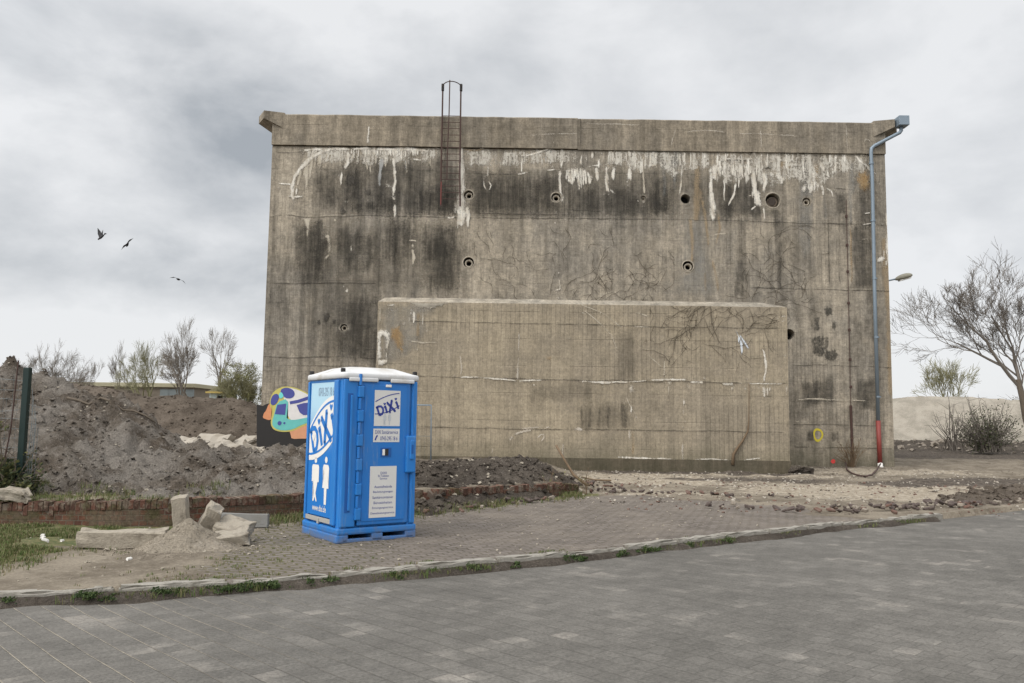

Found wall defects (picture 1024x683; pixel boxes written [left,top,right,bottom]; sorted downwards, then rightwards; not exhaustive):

damp [278,127,875,288]
damp [813,308,837,360]